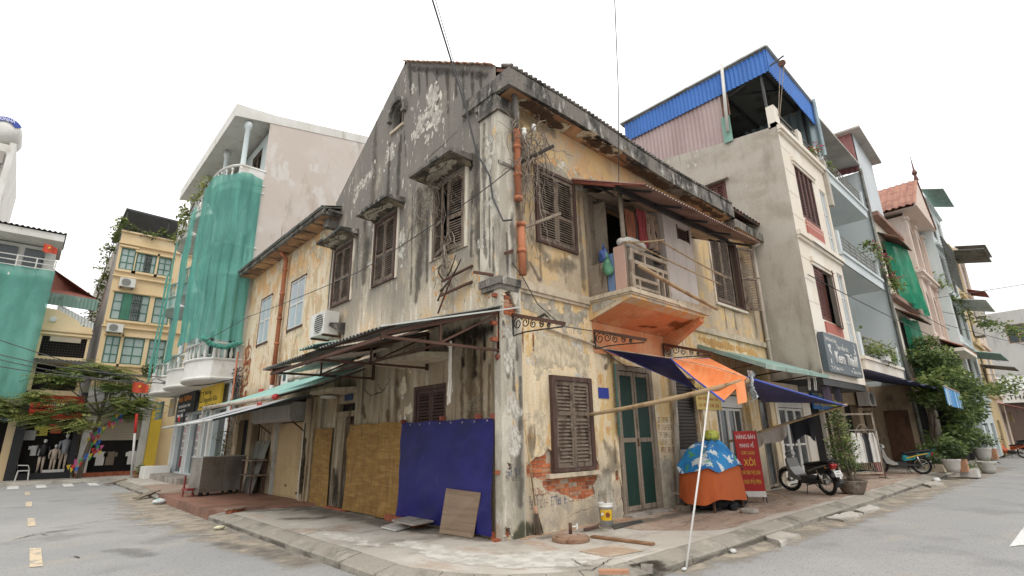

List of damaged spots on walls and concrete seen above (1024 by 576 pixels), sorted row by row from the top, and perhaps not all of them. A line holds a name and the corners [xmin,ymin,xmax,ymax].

peeling [411,81,444,146]
flaking render [471,272,621,513]